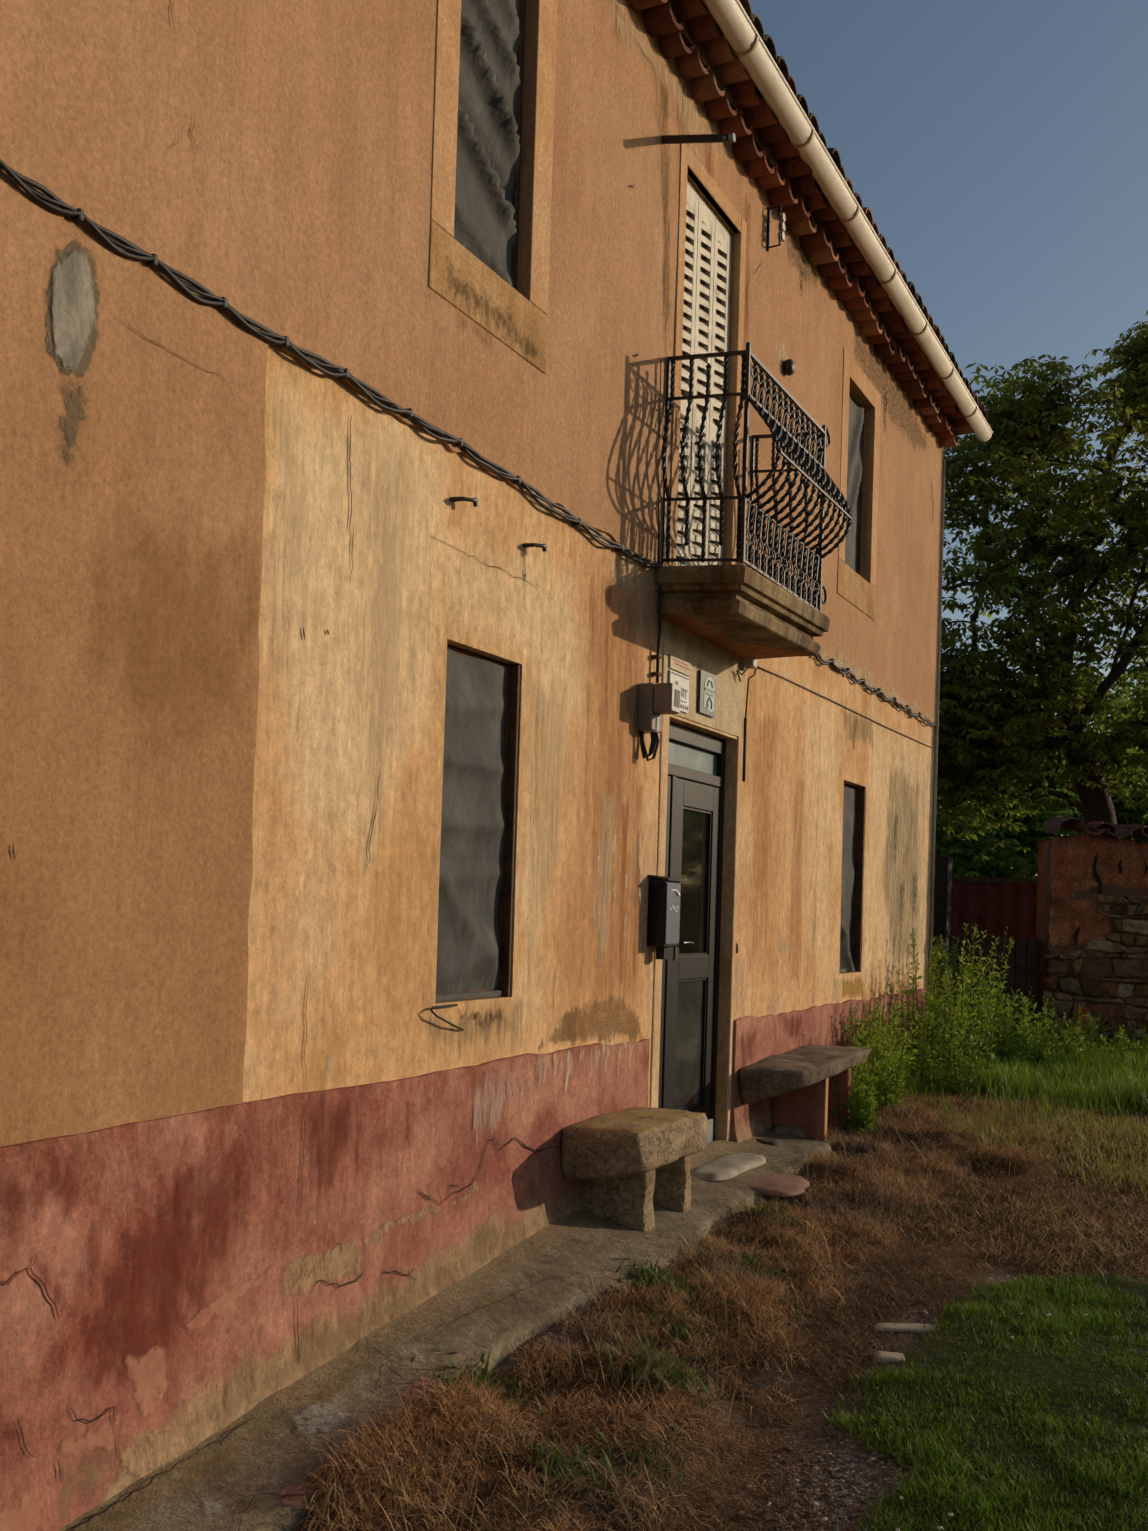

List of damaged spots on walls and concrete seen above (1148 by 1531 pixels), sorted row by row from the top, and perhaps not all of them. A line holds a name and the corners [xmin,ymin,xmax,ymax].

spalling [46,240,100,466]
crack [366,775,380,869]
damp [539,997,640,1049]
crack [419,1137,562,1205]
crack [0,1252,59,1318]
spalling [187,1183,478,1330]
crack [17,1418,61,1484]
crack [71,1406,116,1464]